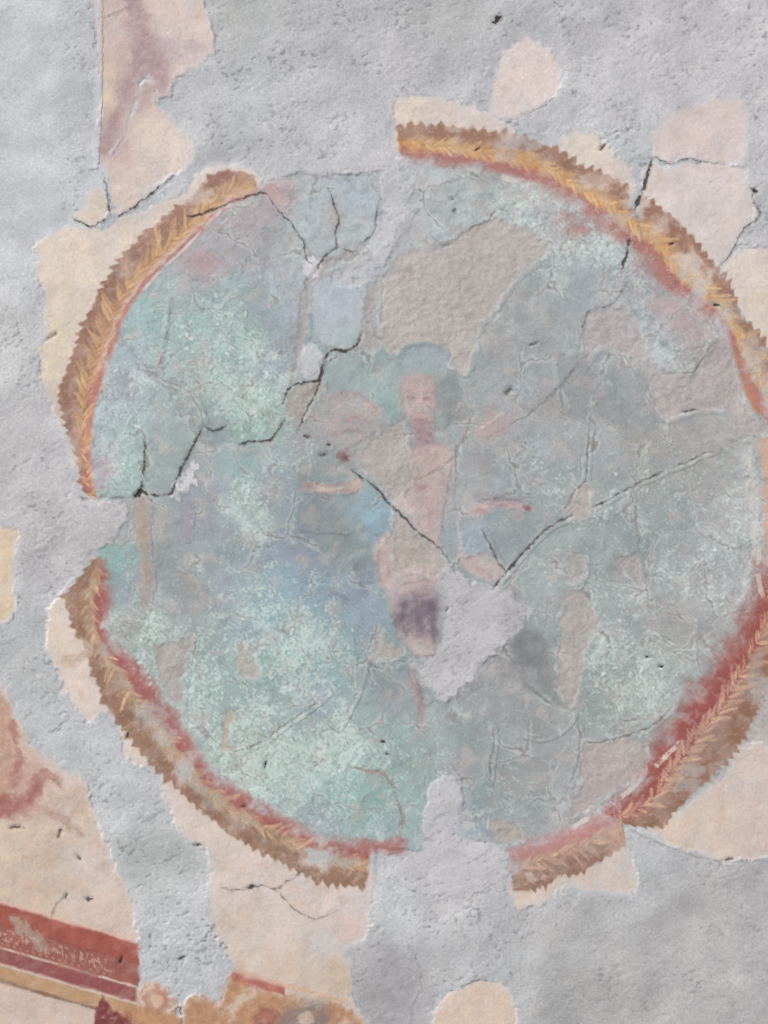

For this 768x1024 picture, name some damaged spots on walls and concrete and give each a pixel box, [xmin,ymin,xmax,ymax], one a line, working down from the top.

crack [73,174,175,228]
crack [185,186,380,280]
crack [429,207,508,247]
crack [513,156,724,422]
peeling [88,354,152,500]
crack [77,297,363,500]
crack [414,411,470,481]
crack [297,468,448,558]
crack [477,425,756,594]
crack [219,866,340,920]